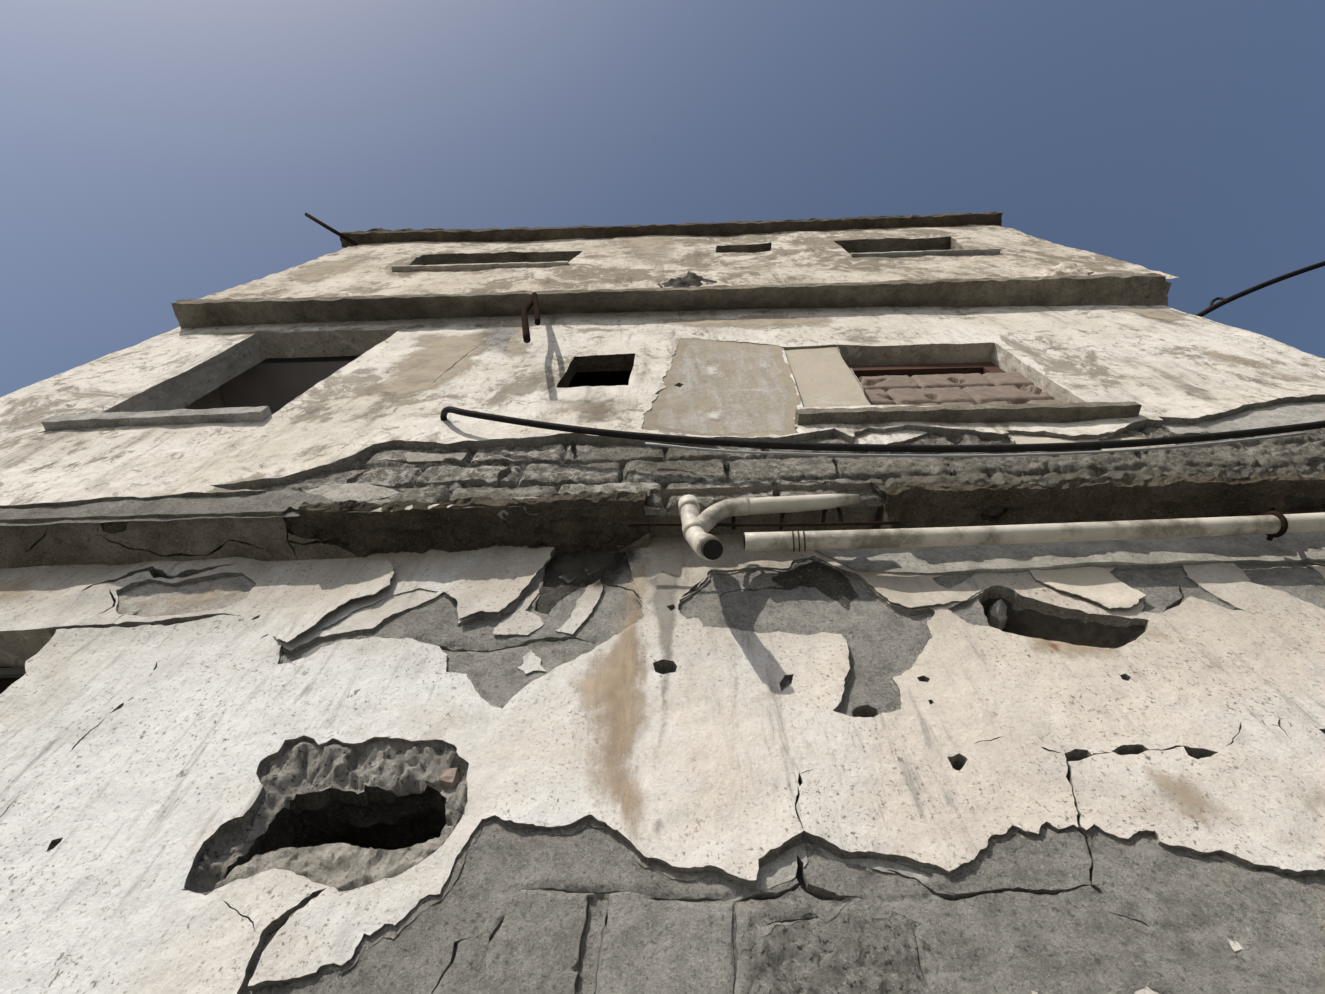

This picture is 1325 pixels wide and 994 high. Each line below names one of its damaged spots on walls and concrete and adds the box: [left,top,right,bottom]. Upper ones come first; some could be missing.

peeling [239,338,1325,717]
peeling [244,818,1325,994]
crack [943,890,1058,901]